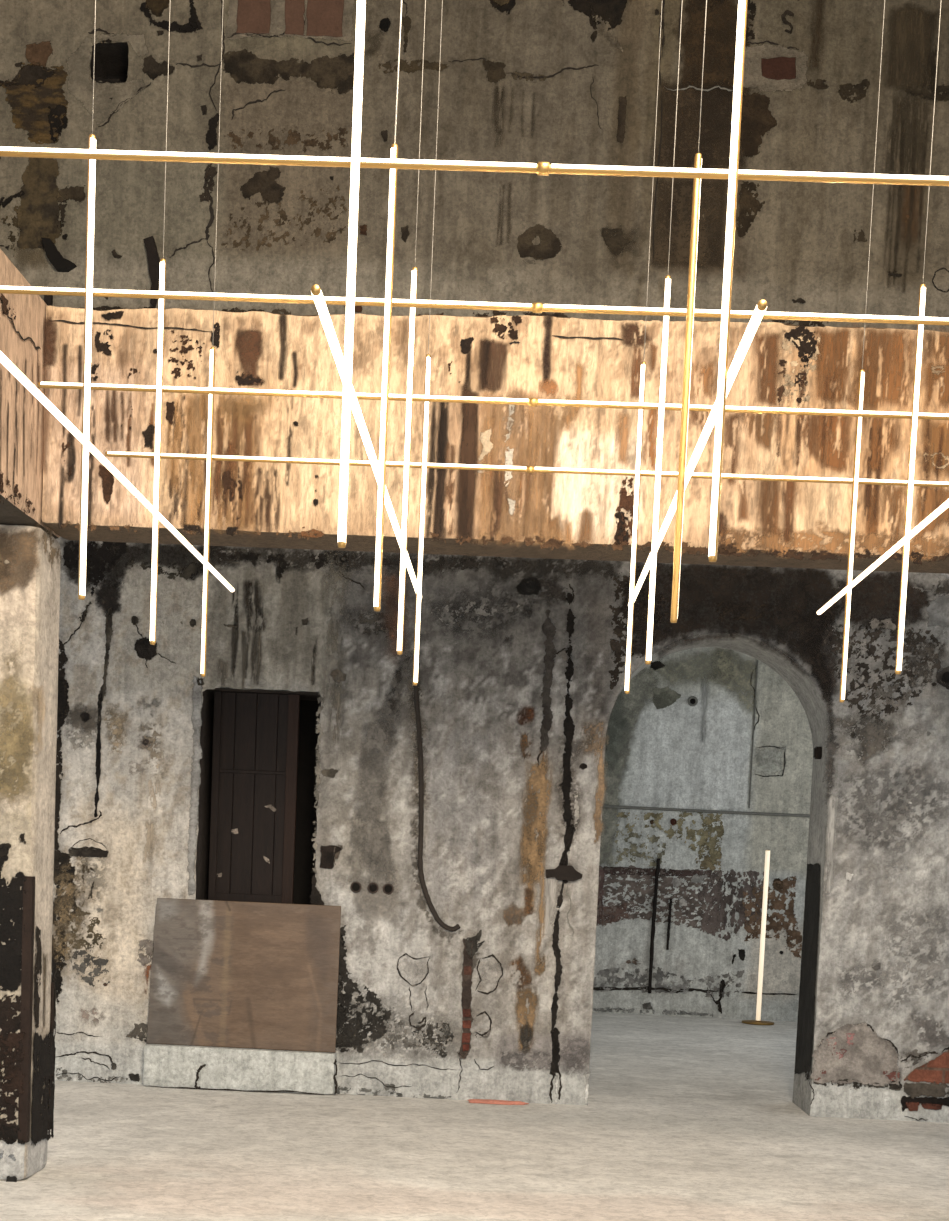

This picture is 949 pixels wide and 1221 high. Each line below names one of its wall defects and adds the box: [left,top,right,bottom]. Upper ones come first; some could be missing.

flaking render [0,0,367,265]
crack [169,0,225,293]
damp [652,0,777,266]
damp [58,345,114,528]
crack [54,311,220,381]
damp [279,314,298,390]
damp [426,315,592,546]
peeling [0,833,57,1161]
rust [503,707,551,1051]
rust [582,721,605,843]
peeling [310,477,949,905]
peeling [596,812,820,1080]